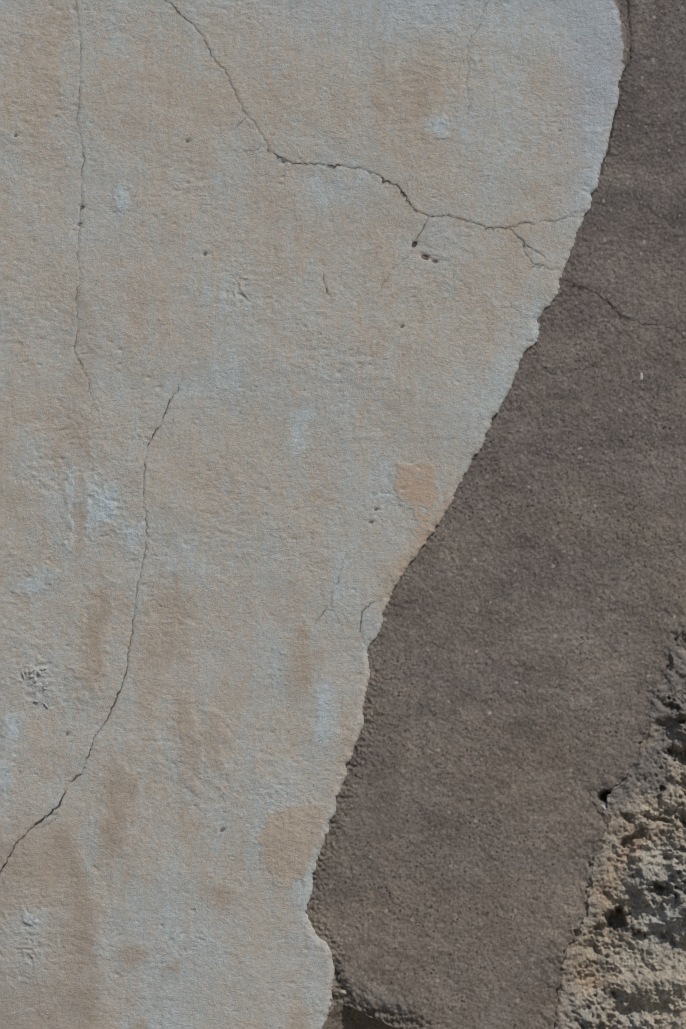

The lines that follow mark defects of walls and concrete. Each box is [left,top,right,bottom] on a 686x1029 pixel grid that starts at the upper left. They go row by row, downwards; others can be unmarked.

flaking render [608,0,627,72]
crack [165,0,686,339]
crack [1,384,179,871]
flaking render [253,797,332,890]
spalling [325,1001,394,1029]